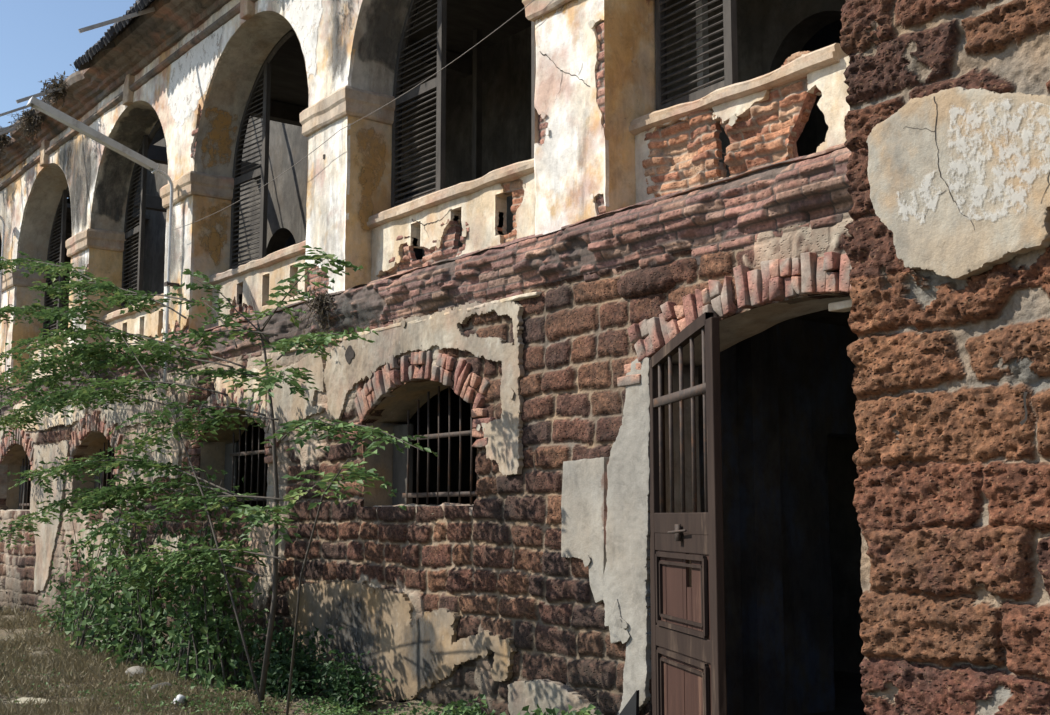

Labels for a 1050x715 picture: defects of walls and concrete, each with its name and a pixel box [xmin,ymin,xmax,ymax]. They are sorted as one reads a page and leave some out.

water stain [332,0,353,78]
water stain [359,0,410,70]
crack [540,52,590,92]
spalling [781,51,811,67]
peeling [356,129,386,231]
spalling [380,215,469,278]
spalling [497,179,524,243]
spalling [642,77,822,197]
crack [903,98,974,226]
peeling [897,99,1050,223]
water stain [324,596,381,676]
water stain [410,615,439,685]